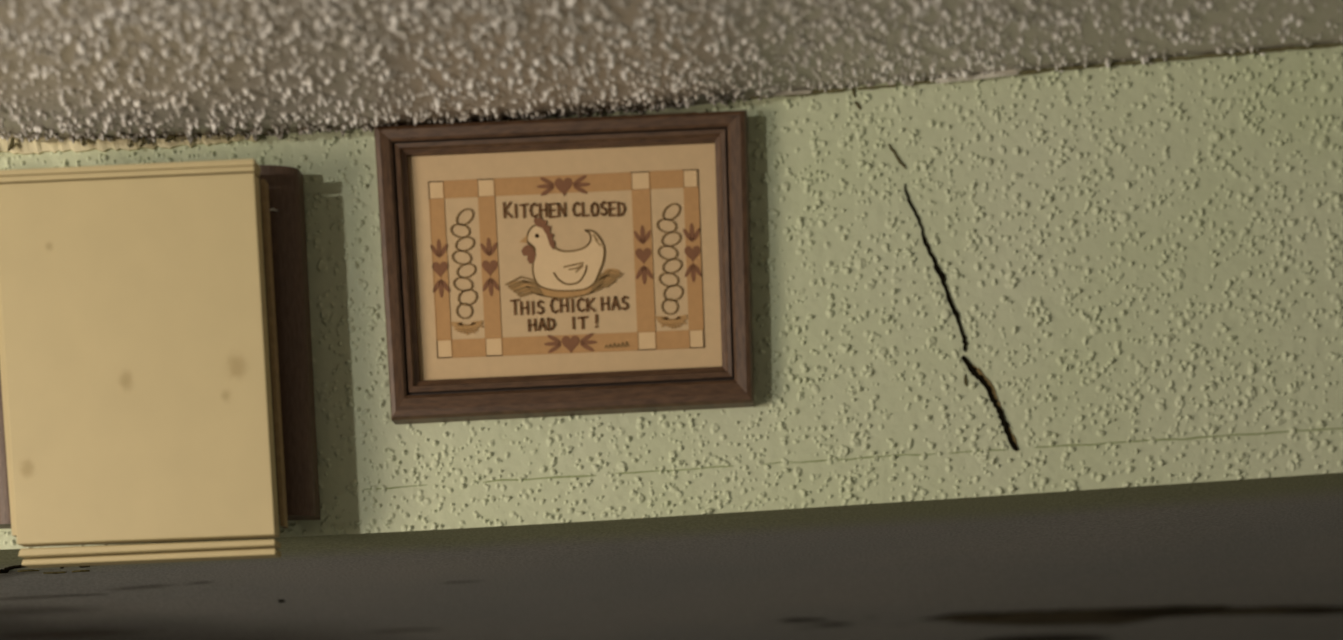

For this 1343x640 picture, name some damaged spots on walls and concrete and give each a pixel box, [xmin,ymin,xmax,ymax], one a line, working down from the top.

crack [1017,43,1343,75]
crack [751,80,936,110]
crack [763,144,1343,465]
crack [364,483,424,491]
crack [485,466,731,482]
water stain [928,606,1343,640]